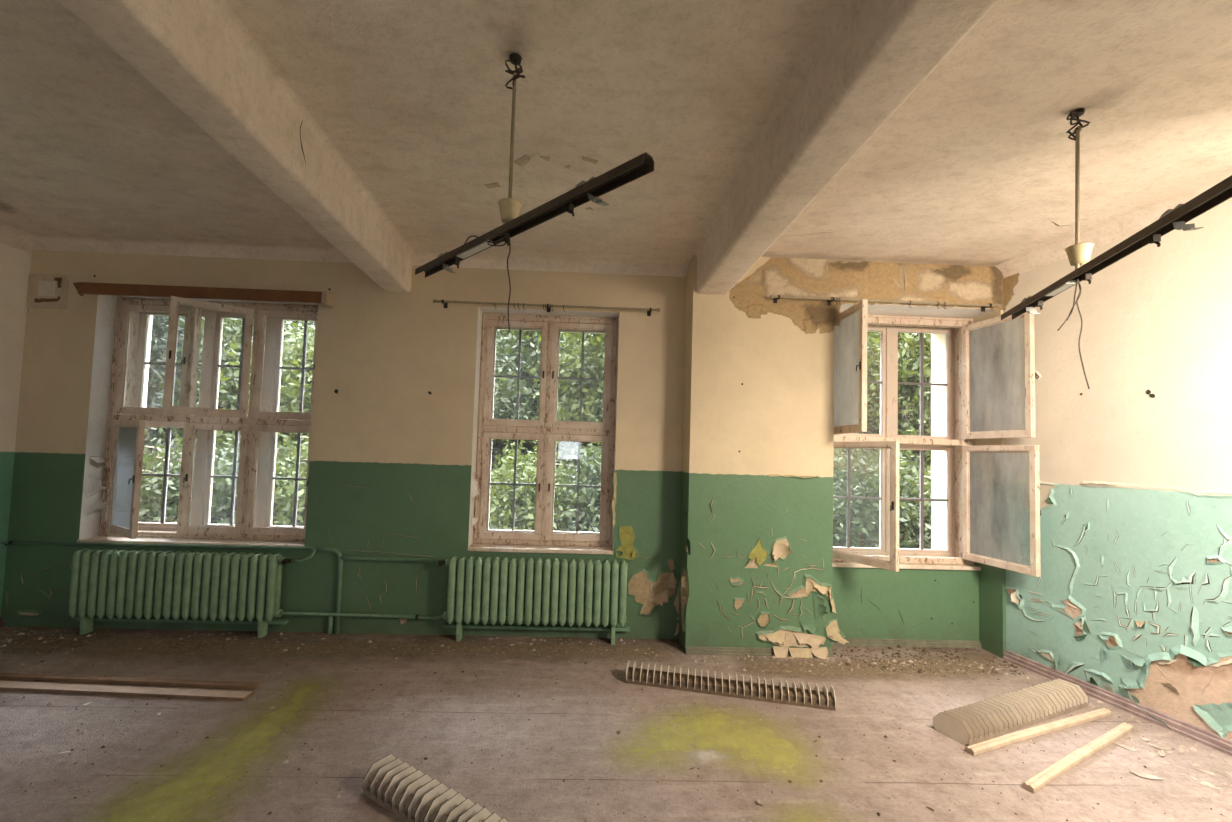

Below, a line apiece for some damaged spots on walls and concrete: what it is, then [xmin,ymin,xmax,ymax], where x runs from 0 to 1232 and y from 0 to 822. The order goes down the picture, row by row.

peeling [1023,480,1069,519]
peeling [611,472,691,637]
peeling [729,536,793,611]
peeling [755,568,849,659]
peeling [1206,556,1225,565]
spalling [1005,587,1232,741]